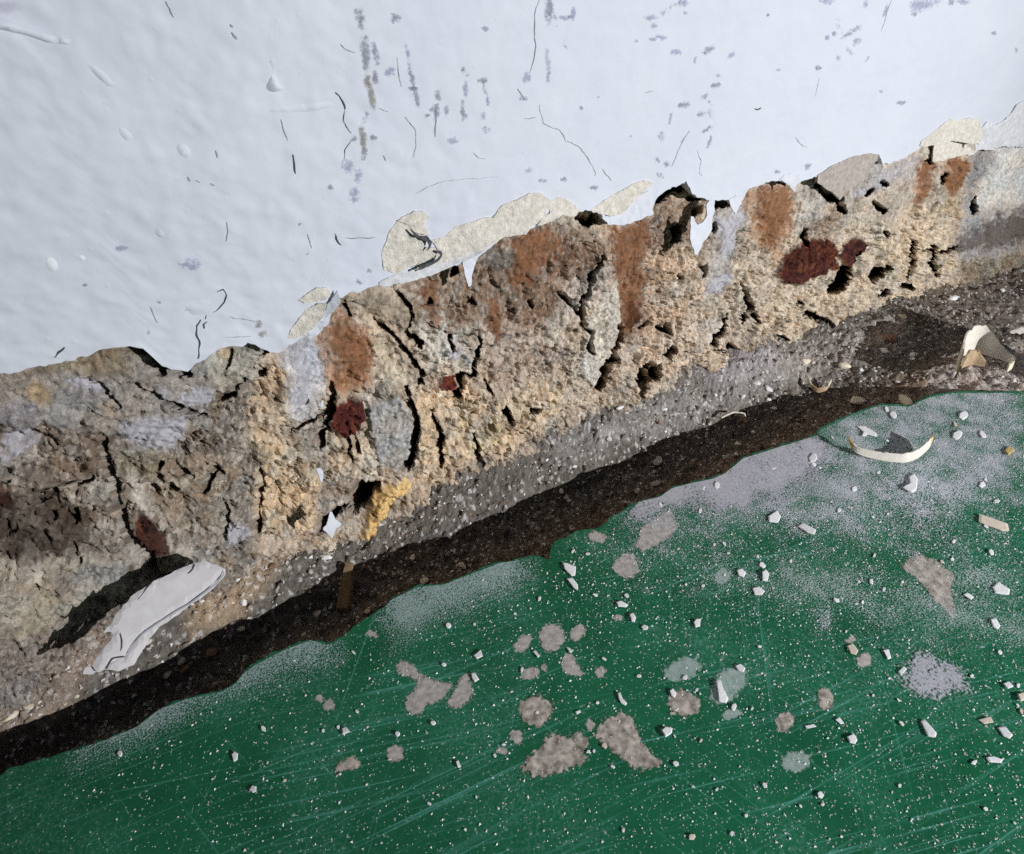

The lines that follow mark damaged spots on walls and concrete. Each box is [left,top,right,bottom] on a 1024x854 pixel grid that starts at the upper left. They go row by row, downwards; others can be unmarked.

crack [189,289,255,359]
spalling [0,100,1024,725]
peeling [661,655,762,737]